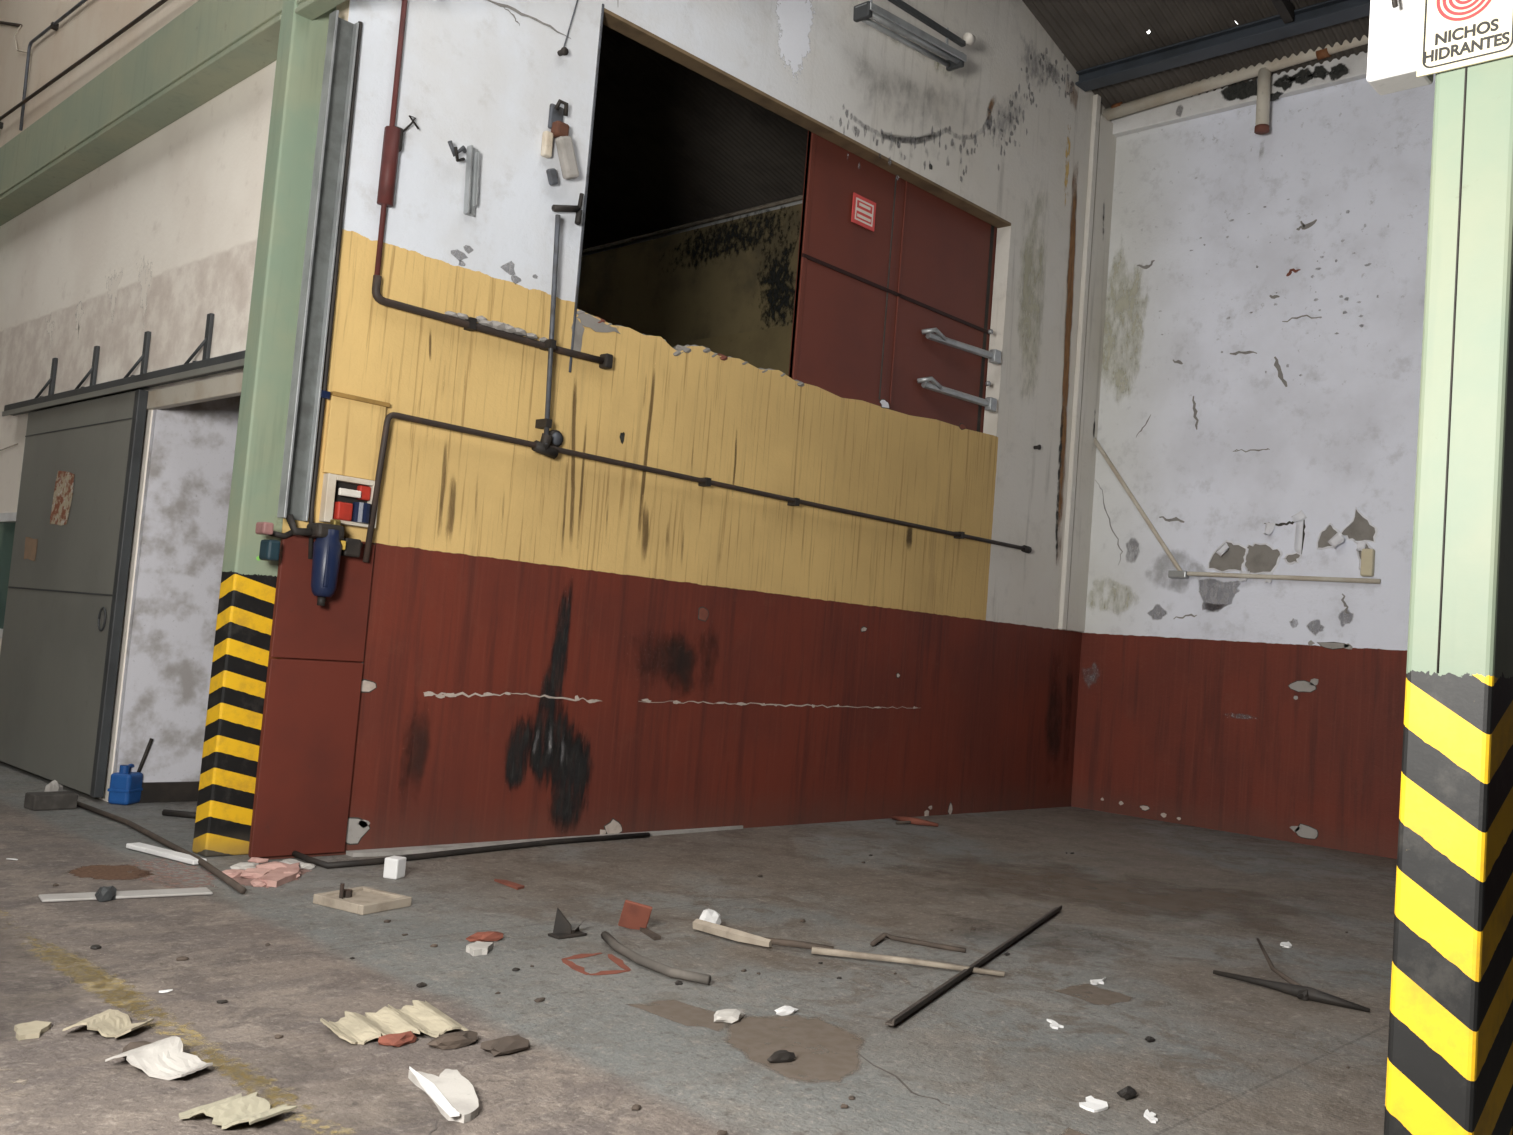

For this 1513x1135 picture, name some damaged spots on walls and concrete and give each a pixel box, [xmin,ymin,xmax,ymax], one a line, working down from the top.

damp [839,53,1073,182]
spalling [571,310,620,352]
peeling [1200,507,1378,611]
damp [506,590,590,828]
spalling [1288,678,1318,700]